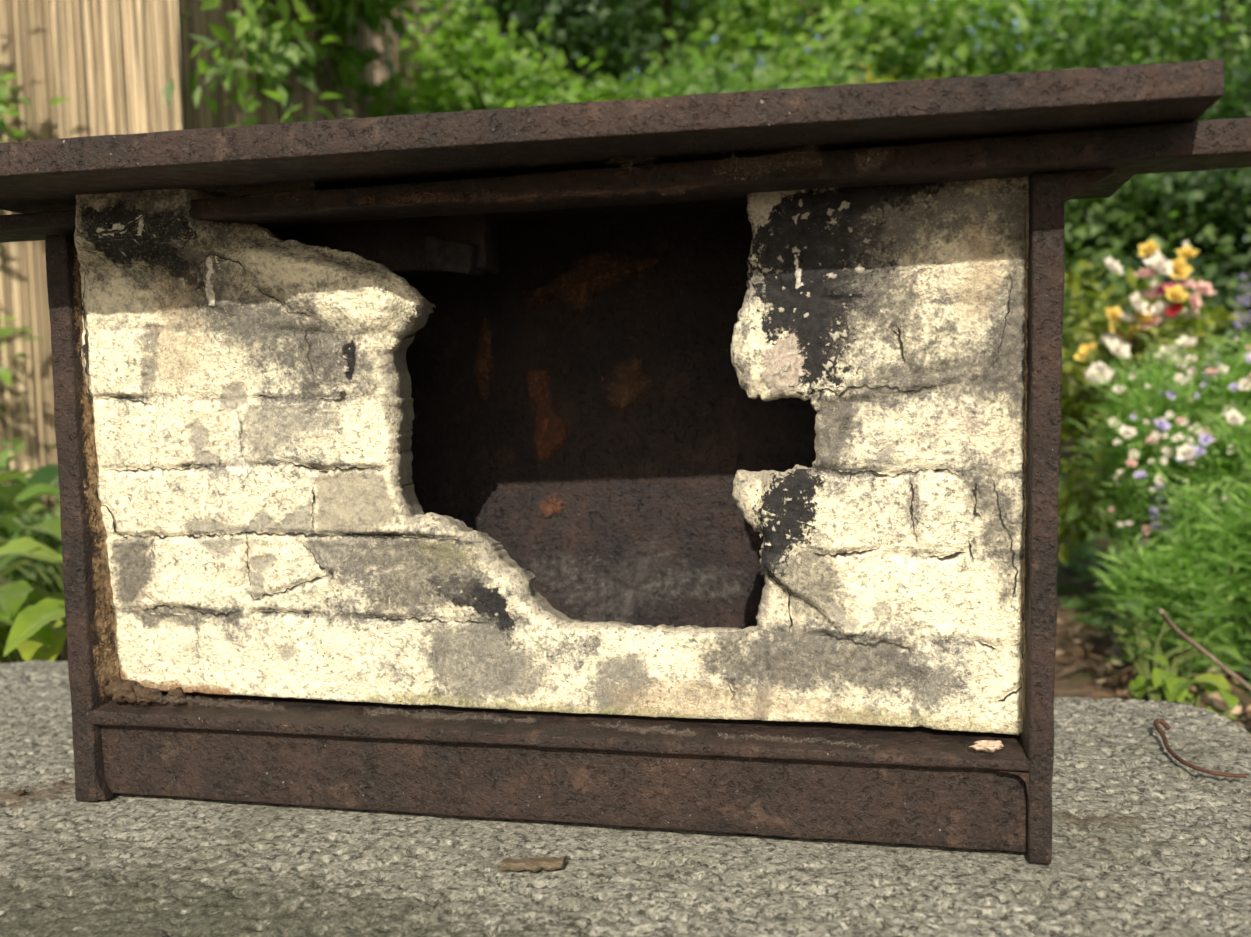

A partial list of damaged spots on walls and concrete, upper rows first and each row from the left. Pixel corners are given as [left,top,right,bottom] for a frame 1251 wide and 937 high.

corrosion [358,181,704,206]
damp [96,215,144,238]
peeling [750,246,807,273]
damp [794,254,803,289]
spalling [760,321,848,397]
corrosion [527,368,570,460]
crack [810,206,1028,715]